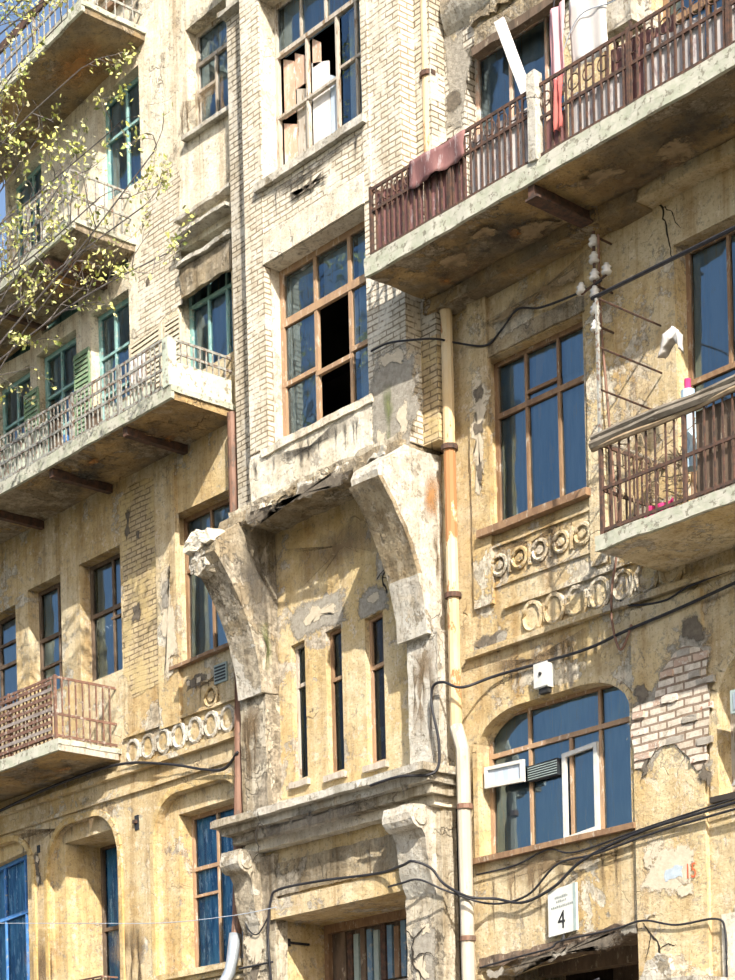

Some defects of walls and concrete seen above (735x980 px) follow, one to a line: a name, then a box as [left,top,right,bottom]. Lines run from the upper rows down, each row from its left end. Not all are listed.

crack [659,205,680,263]
peeling [470,367,491,496]
peeling [287,588,348,640]
peeling [358,584,389,619]
flaking render [629,615,716,787]
crack [406,926,434,980]